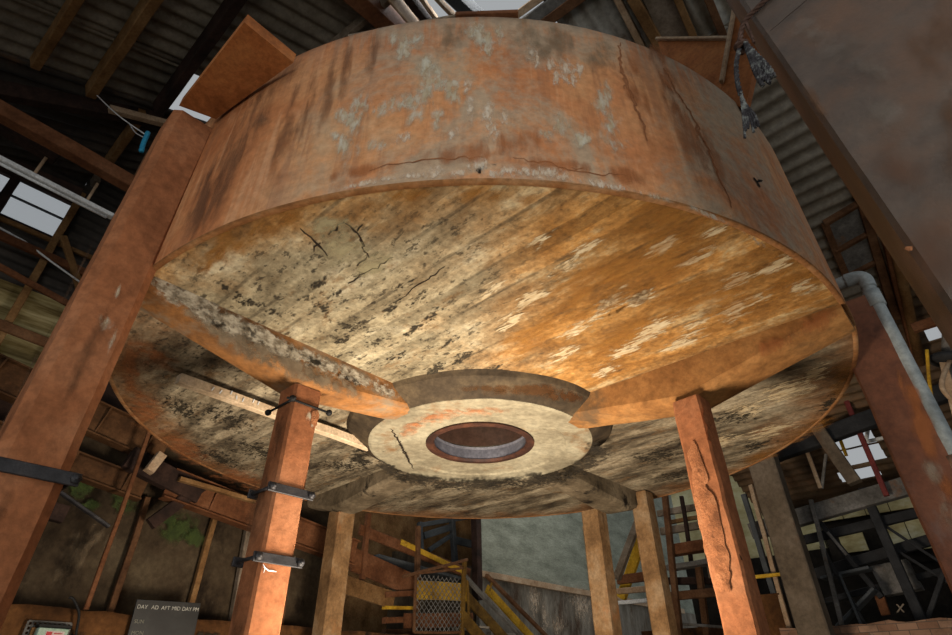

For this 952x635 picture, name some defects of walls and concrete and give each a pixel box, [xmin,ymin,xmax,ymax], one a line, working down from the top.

crack [617,43,648,141]
crack [663,68,732,207]
crack [513,157,627,176]
crack [300,222,393,284]
damp [298,276,342,313]
damp [184,309,361,399]
peeling [151,277,395,398]
damp [334,322,384,347]
damp [403,307,443,336]
damp [427,345,480,375]
corrosion [464,384,583,402]
crack [391,429,414,469]